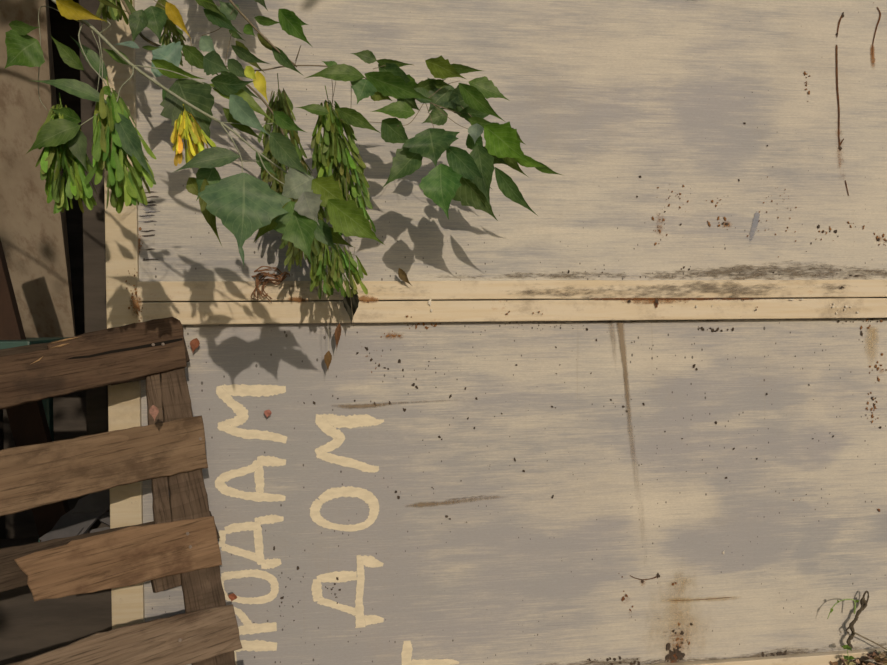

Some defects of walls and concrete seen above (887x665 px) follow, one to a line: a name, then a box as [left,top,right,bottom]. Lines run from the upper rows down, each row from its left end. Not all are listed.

damp [636,264,887,297]
damp [617,322,630,412]
rust [665,622,693,663]